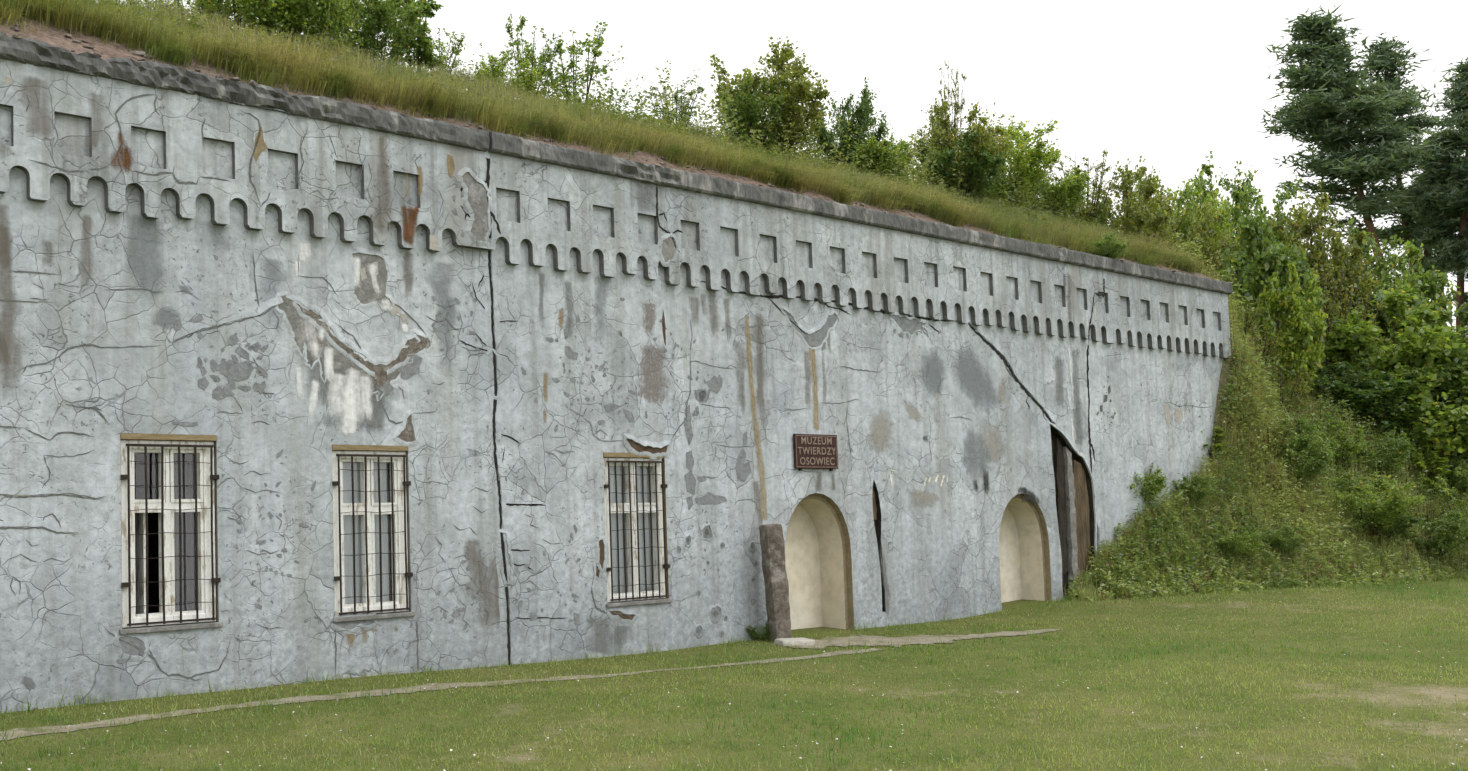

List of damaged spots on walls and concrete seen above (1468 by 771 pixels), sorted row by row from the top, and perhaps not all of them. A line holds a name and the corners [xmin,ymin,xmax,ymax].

corrosion [112,134,131,169]
corrosion [402,167,422,244]
damp [0,214,17,381]
crack [0,404,108,596]
crack [0,255,361,373]
peeling [174,314,274,425]
spalling [273,247,526,402]
spalling [392,409,419,447]
crack [385,154,631,671]
damp [741,316,767,520]
crack [656,186,1105,472]
damp [965,431,998,491]